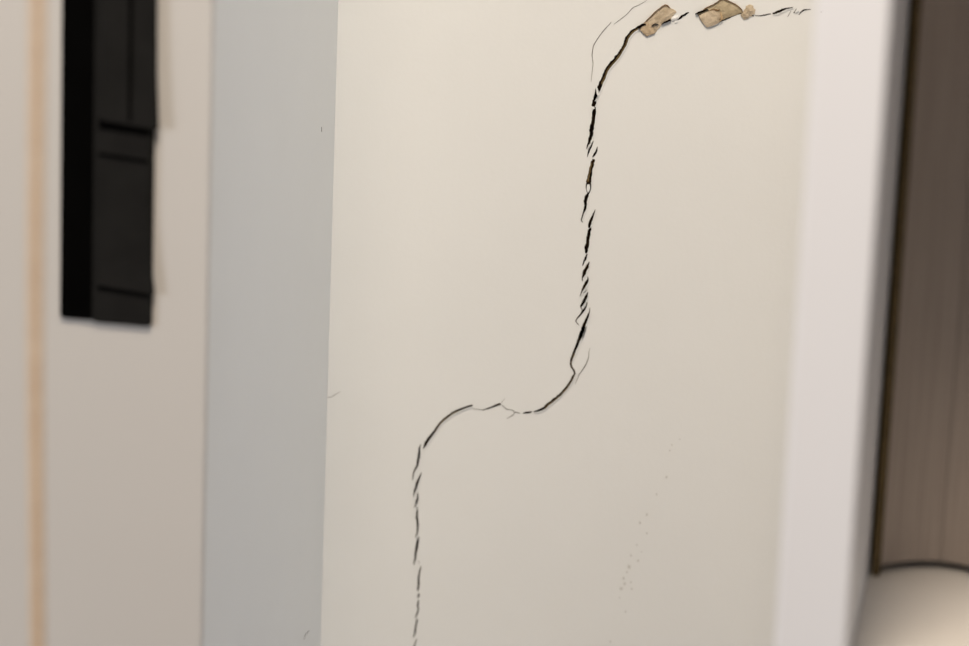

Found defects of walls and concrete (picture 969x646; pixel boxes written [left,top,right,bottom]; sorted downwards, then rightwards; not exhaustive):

flaking render [640,4,678,36]
flaking render [697,0,755,27]
crack [412,2,811,646]